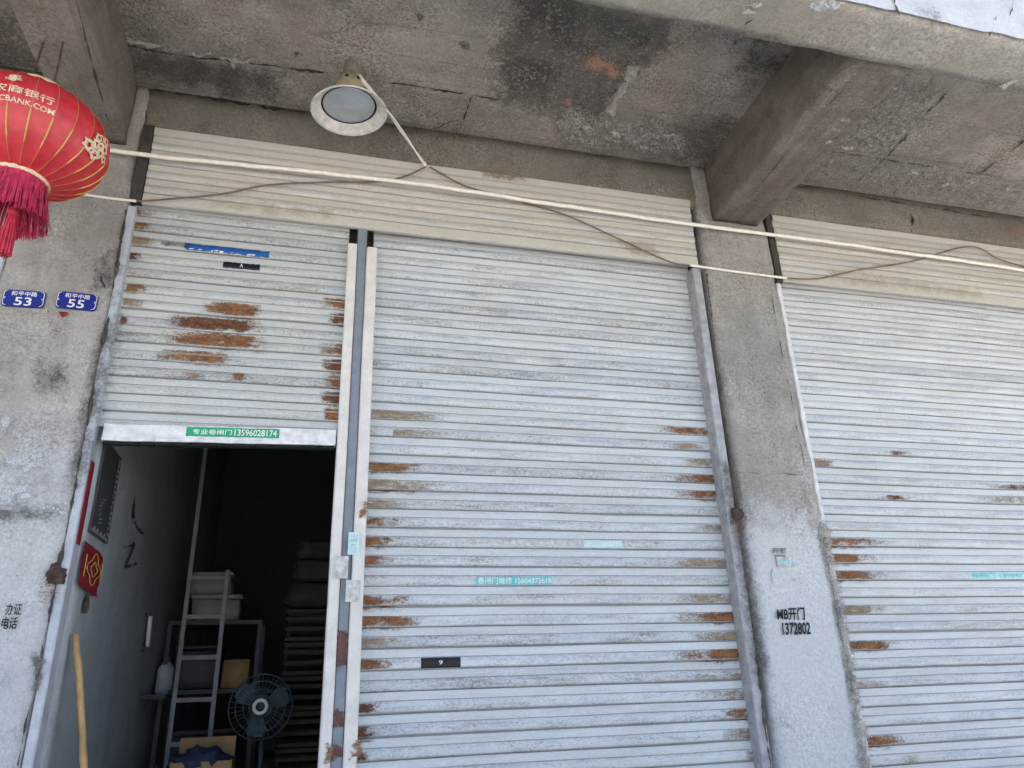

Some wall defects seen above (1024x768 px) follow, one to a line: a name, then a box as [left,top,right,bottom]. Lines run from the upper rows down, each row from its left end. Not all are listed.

leakage [488,0,680,123]
crack [377,80,501,134]
crack [833,86,1024,233]
corrosion [157,302,264,378]
corrosion [371,410,447,437]
corrosion [664,426,717,502]
corrosion [358,462,439,565]
corrosion [831,538,886,584]
corrosion [360,595,419,670]
corrosion [674,594,753,759]
corrosion [849,641,895,654]
corrosion [867,735,905,749]